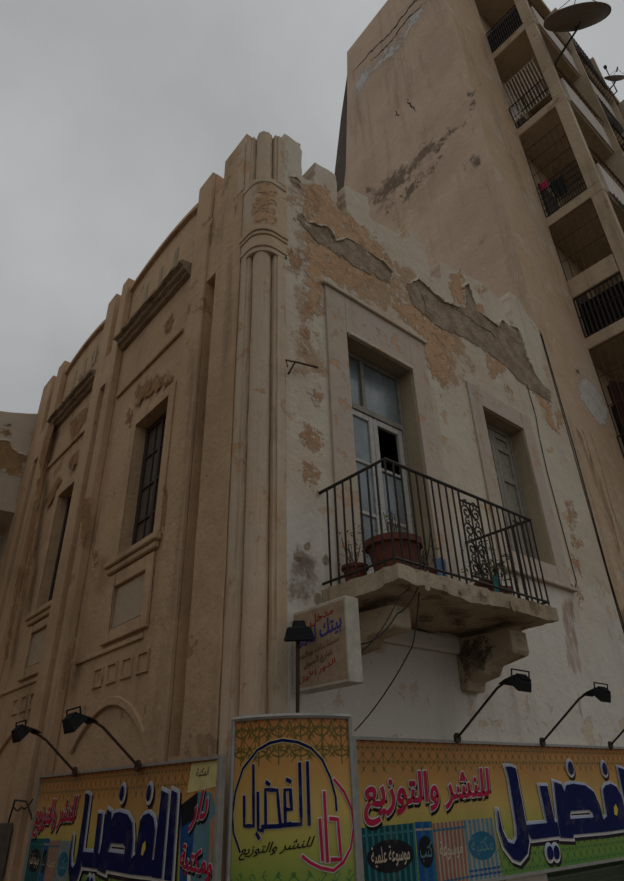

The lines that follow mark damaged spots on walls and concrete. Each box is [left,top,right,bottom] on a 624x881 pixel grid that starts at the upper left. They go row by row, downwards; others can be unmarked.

crack [354,0,424,70]
spalling [251,175,560,435]
spalling [0,428,28,479]
peeling [298,421,325,492]